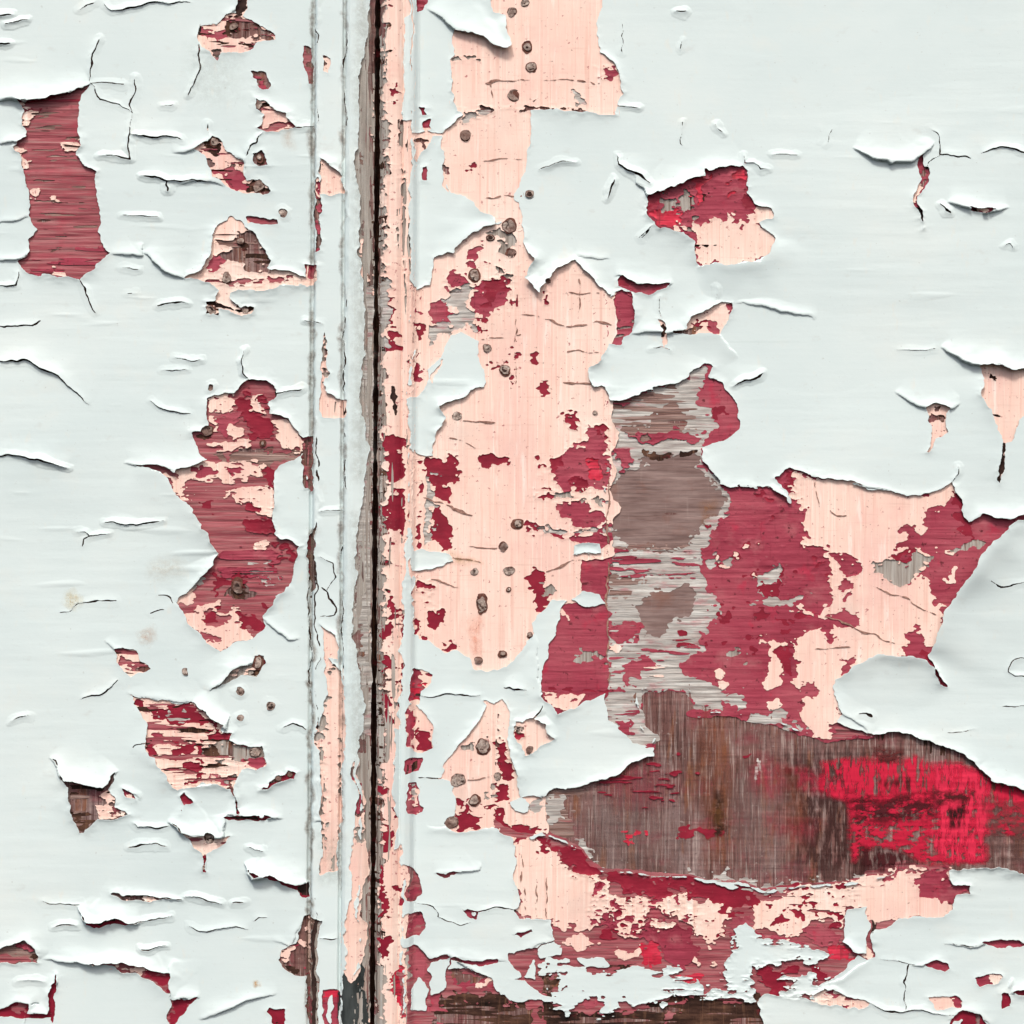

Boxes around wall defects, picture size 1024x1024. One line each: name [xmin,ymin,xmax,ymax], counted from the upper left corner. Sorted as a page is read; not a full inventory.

crack [86,40,207,191]
peeling [0,71,345,316]
peeling [197,0,275,61]
peeling [53,379,317,873]
peeling [278,0,1024,1024]